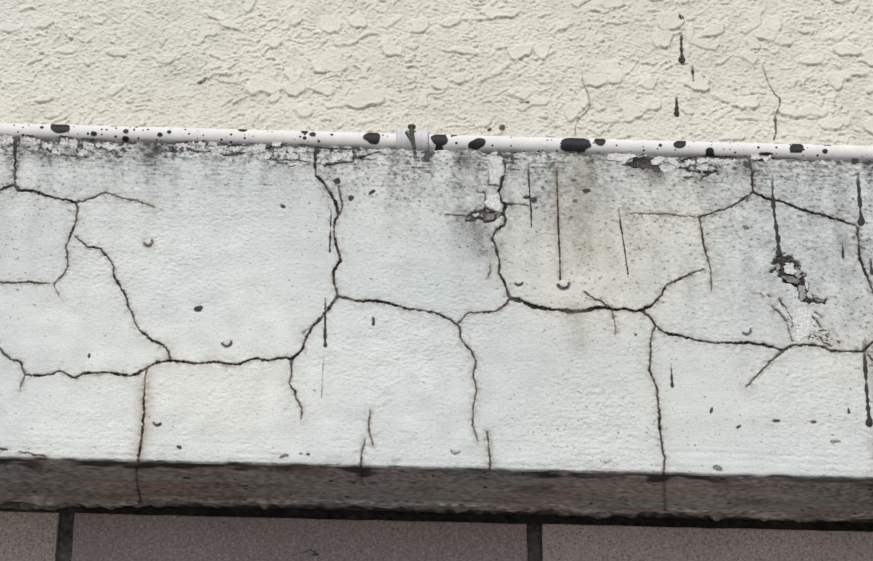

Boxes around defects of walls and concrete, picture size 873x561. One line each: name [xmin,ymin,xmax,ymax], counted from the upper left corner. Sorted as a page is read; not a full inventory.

water stain [431,134,457,151]
water stain [466,138,485,163]
water stain [560,138,606,153]
water stain [790,144,803,153]
spalling [607,153,808,179]
water stain [856,179,865,226]
water stain [771,184,782,255]
crack [0,136,873,473]
spalling [760,256,840,347]